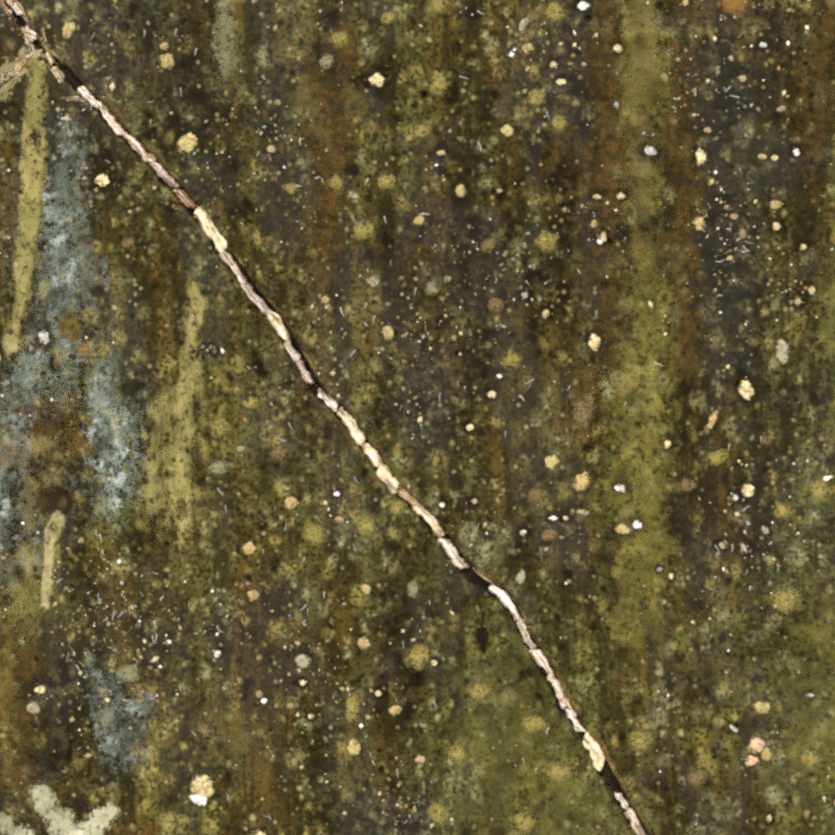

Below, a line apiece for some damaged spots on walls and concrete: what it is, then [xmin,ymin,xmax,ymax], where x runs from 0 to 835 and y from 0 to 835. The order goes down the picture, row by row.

leakage [1,58,50,358]
leakage [0,435,66,624]
leakage [138,278,209,548]
crack [0,0,652,835]
leakage [590,0,688,663]
leakage [805,264,835,443]